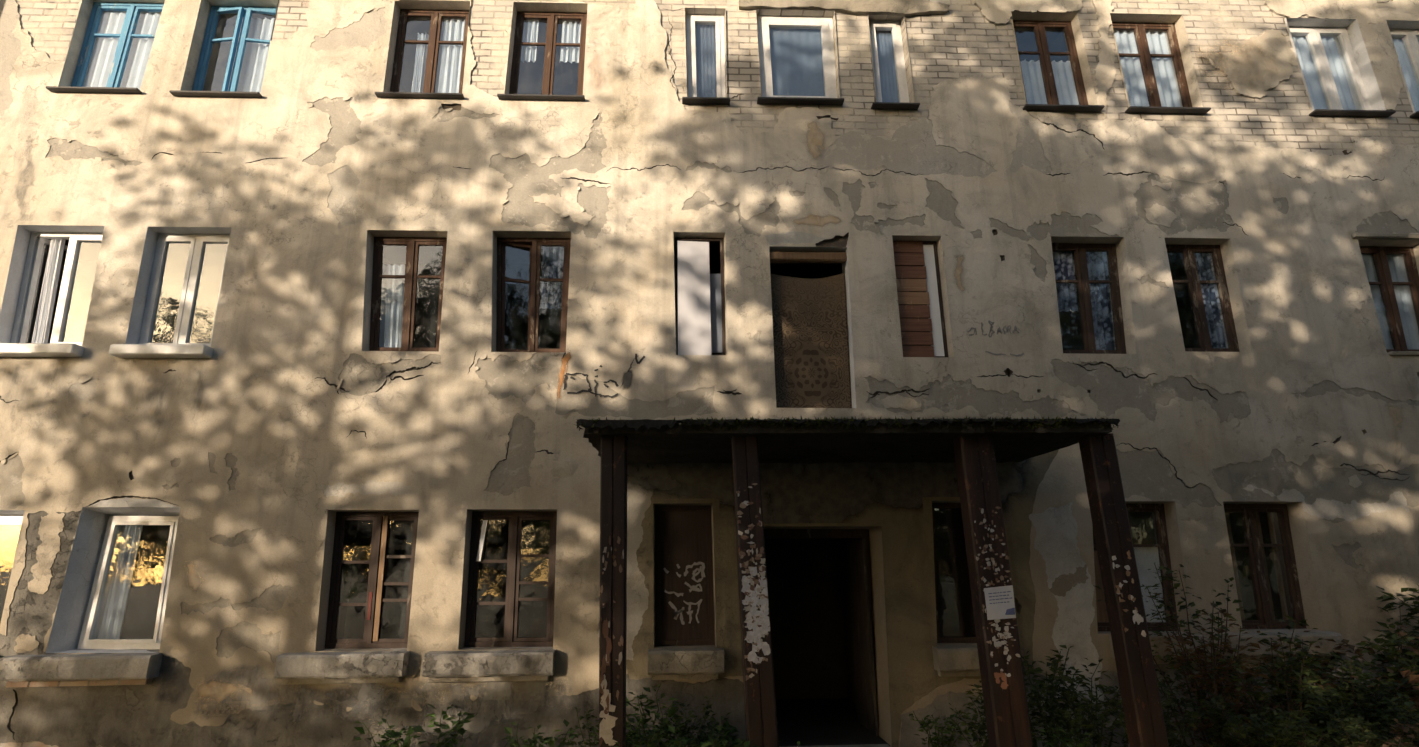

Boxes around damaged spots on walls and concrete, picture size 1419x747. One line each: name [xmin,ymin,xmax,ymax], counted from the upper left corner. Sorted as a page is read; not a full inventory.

peeling [271,0,400,52]
flaking render [433,0,636,122]
peeling [302,97,362,229]
peeling [489,113,611,239]
flaking render [654,0,1419,282]
peeling [335,353,441,396]
peeling [475,352,718,496]
peeling [864,359,1251,423]
peeling [1292,380,1419,406]
peeling [1116,448,1419,523]
peeling [0,452,771,747]